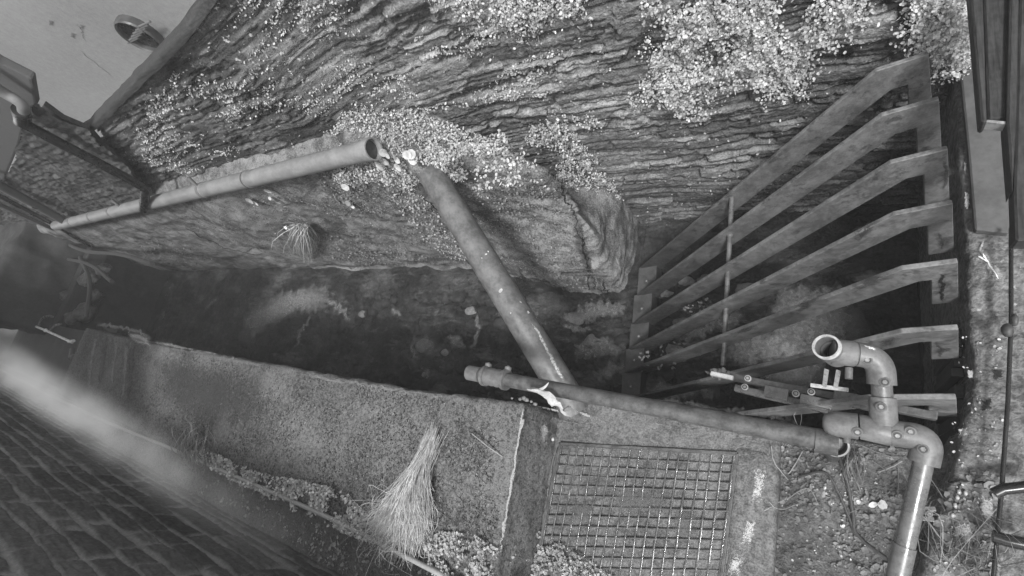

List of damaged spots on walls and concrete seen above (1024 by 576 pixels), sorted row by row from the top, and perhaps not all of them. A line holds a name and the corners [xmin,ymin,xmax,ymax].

water stain [246,293,348,335]
water stain [565,302,625,377]